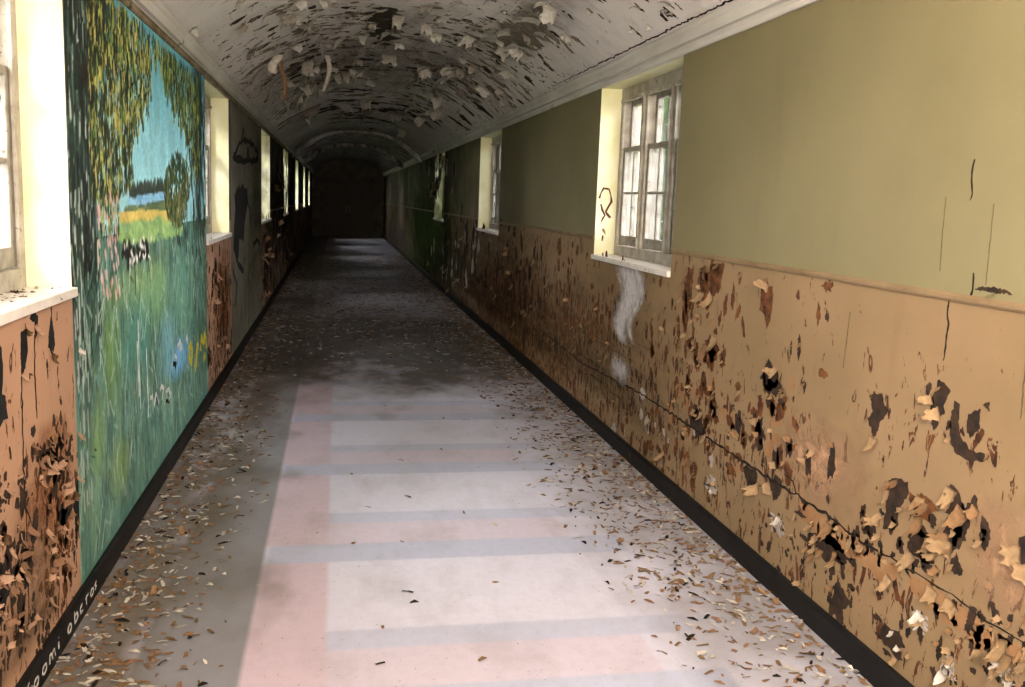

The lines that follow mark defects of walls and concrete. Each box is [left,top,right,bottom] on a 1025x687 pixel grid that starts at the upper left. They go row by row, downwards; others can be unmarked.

peeling [227,0,585,138]
peeling [630,0,682,21]
peeling [0,346,8,427]
peeling [20,313,60,381]
peeling [207,237,234,375]
leakage [614,267,643,342]
peeling [420,151,1025,687]
peeling [0,396,97,684]